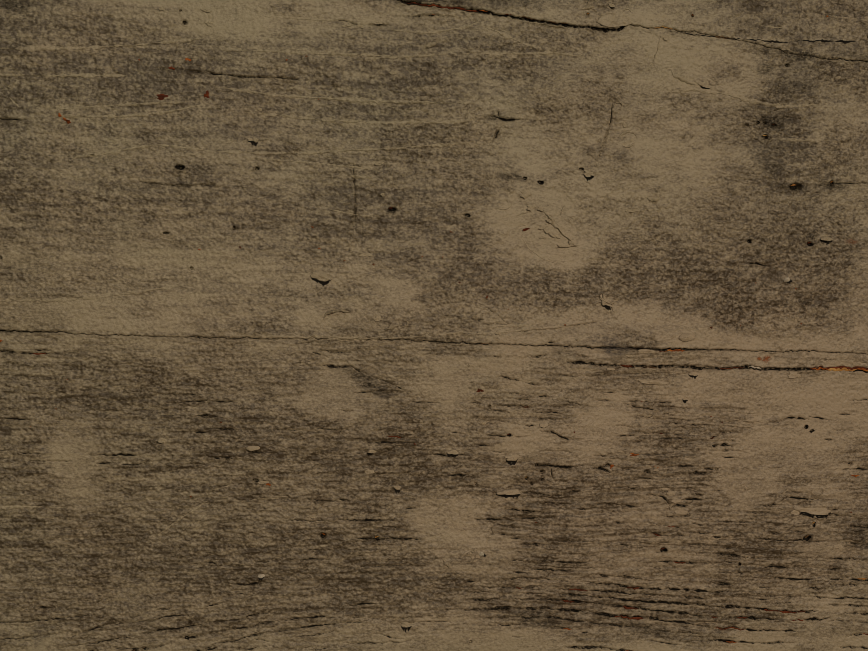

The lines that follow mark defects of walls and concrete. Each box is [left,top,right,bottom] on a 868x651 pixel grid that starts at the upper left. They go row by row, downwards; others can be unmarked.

crack [338,0,867,62]
crack [0,302,868,651]